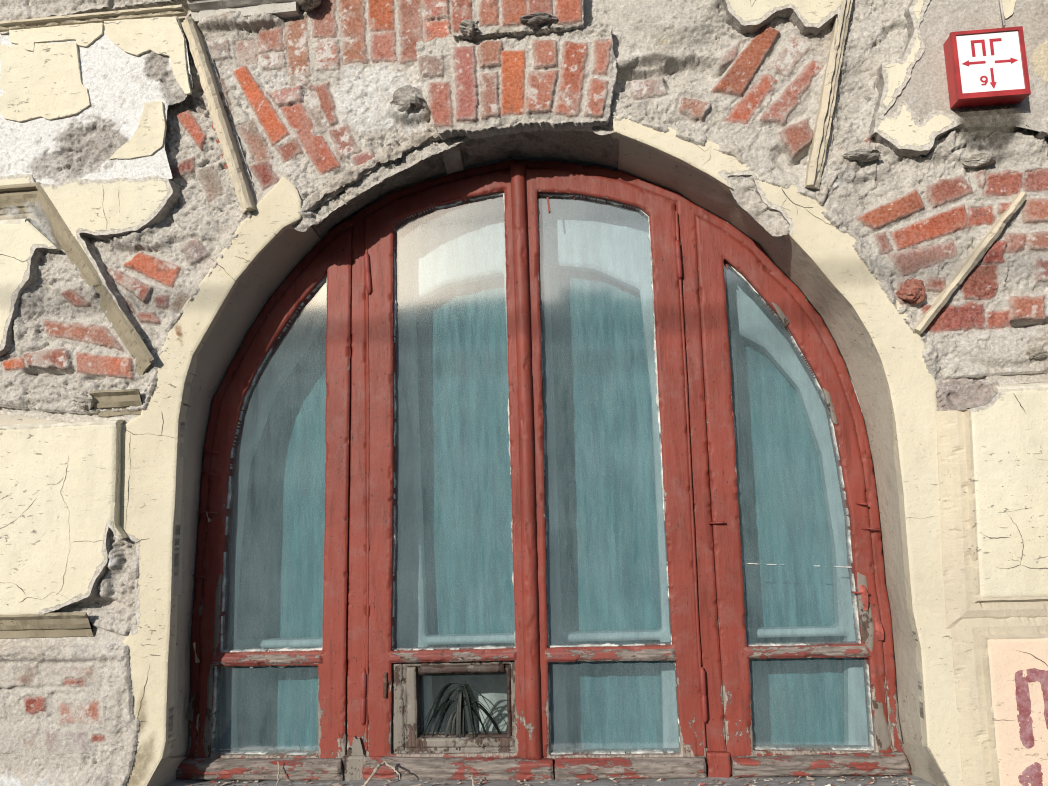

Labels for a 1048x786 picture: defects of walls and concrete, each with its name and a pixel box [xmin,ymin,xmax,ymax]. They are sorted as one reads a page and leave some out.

flaking render [0,0,1048,424]
flaking render [0,527,139,786]
crack [0,412,173,603]
peeling [856,572,884,652]
crack [986,508,1048,569]